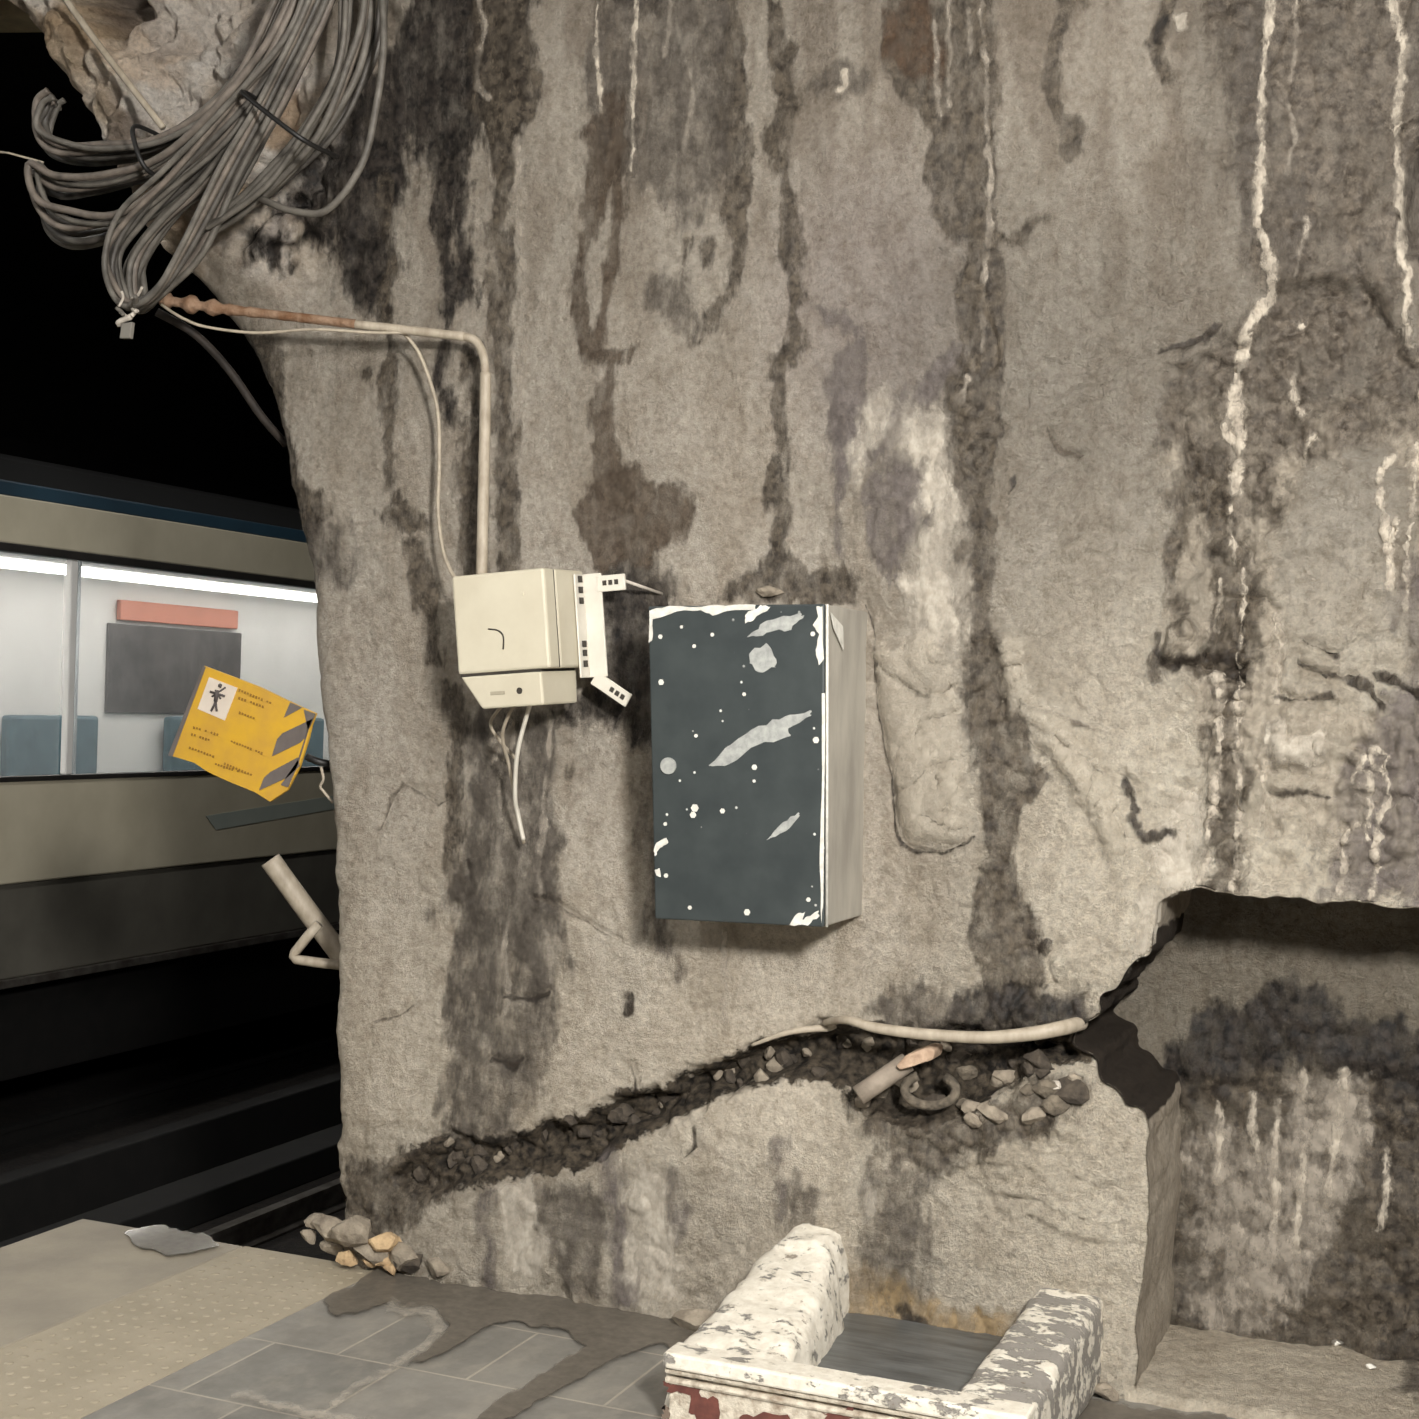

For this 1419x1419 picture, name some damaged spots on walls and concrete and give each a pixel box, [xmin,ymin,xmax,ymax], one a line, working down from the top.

leakage [244,0,859,1147]
leakage [822,0,1087,1053]
leakage [1146,0,1419,907]
crack [490,1057,524,1071]
leakage [324,1146,695,1419]
crack [503,991,551,1002]
crack [685,1126,698,1157]
leakage [1077,1399,1227,1419]
leakage [1164,980,1419,1390]